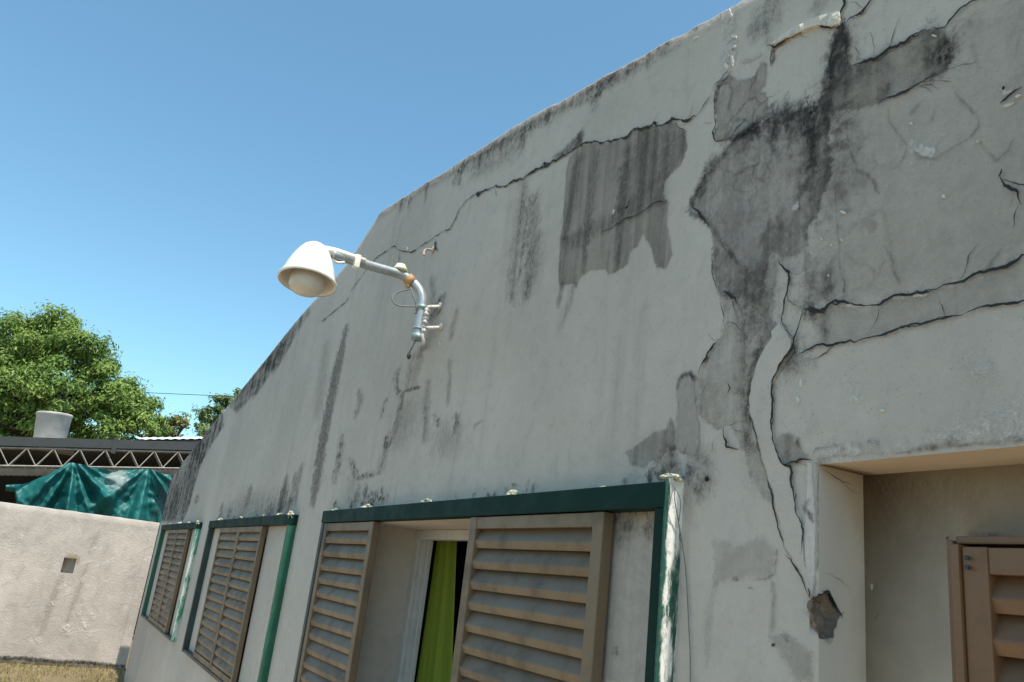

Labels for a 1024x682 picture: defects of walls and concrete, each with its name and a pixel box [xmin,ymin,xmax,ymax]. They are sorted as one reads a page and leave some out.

leakage [394,97,574,206]
crack [323,71,747,321]
leakage [612,127,665,268]
leakage [807,20,848,168]
crack [767,0,976,104]
crack [998,169,1024,228]
leakage [150,419,222,521]
leakage [234,319,302,409]
leakage [311,334,346,505]
crack [698,261,743,392]
crack [711,246,1024,603]
spalling [804,462,842,638]